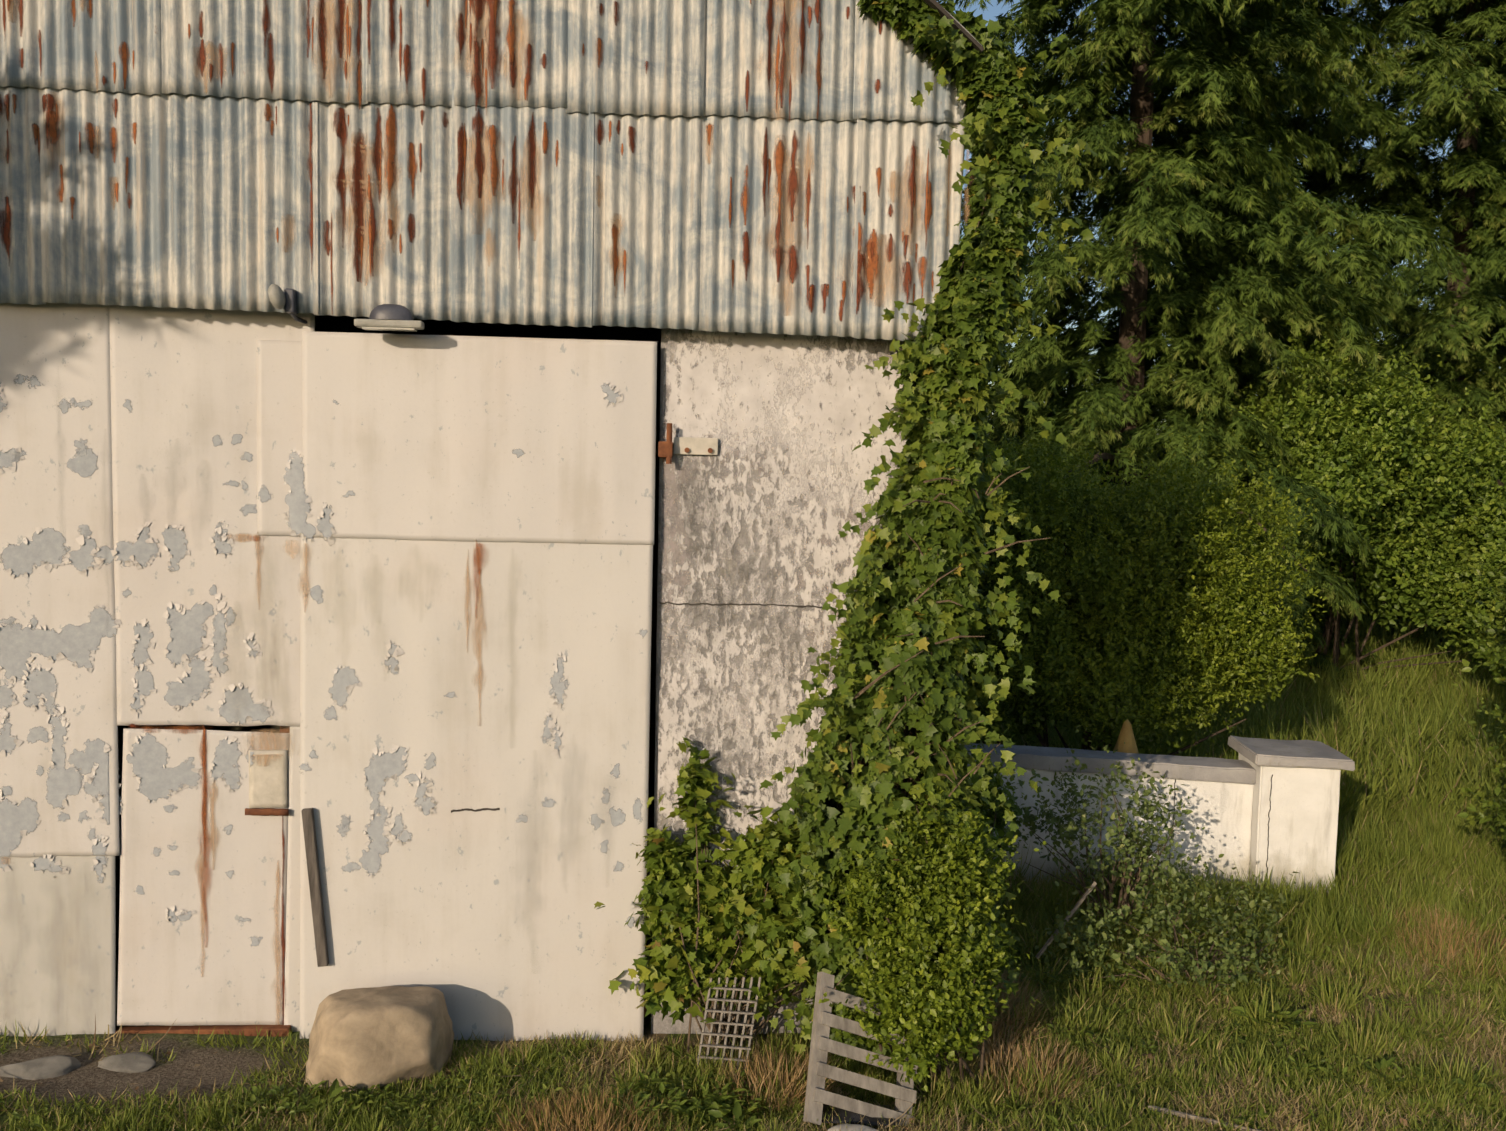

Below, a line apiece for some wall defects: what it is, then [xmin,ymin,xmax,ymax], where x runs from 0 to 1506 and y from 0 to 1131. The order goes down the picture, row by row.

rust [79,42,136,209]
rust [262,0,277,135]
rust [306,0,426,300]
rust [443,0,558,251]
rust [729,0,968,321]
peeling [67,439,98,477]
peeling [0,521,190,579]
peeling [224,447,355,546]
peeling [0,585,274,883]
rust [179,726,215,934]
peeling [324,665,362,720]
peeling [338,744,438,879]